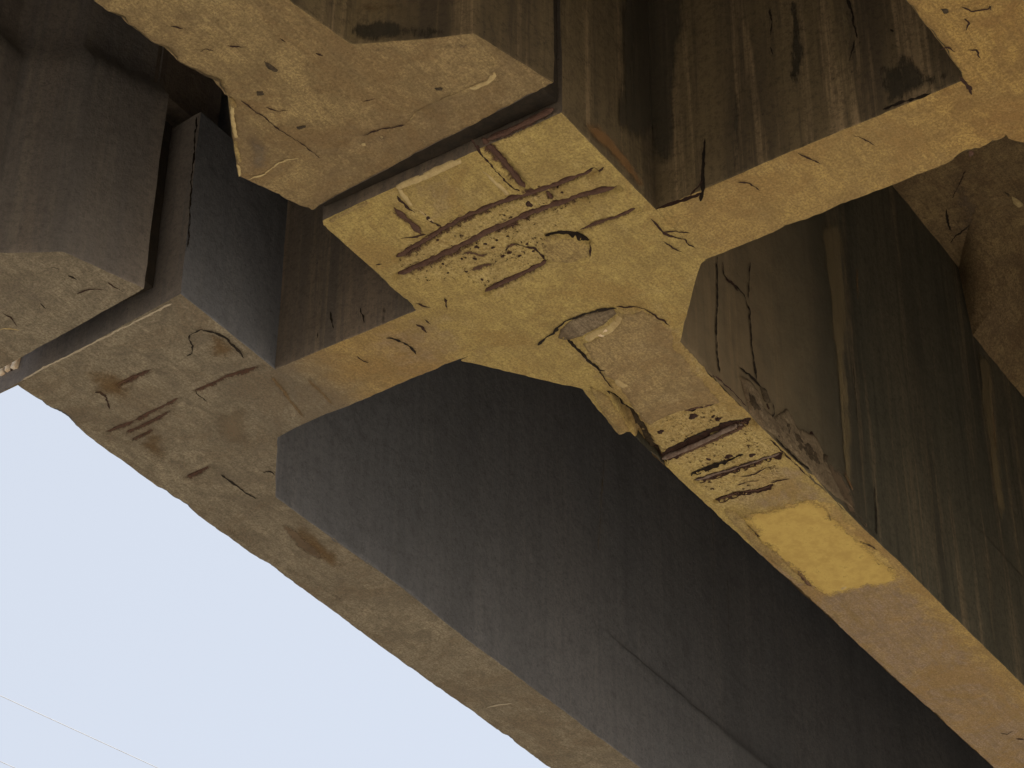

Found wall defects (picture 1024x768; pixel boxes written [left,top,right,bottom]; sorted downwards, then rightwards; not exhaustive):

water stain [882,56,944,110]
crack [242,101,319,157]
crack [187,117,198,247]
rust [393,196,441,234]
spalling [396,108,635,292]
rust [464,251,494,271]
crack [651,140,757,406]
crack [187,329,244,358]
spalling [558,309,622,342]
crack [221,475,256,499]
spalling [590,368,852,587]